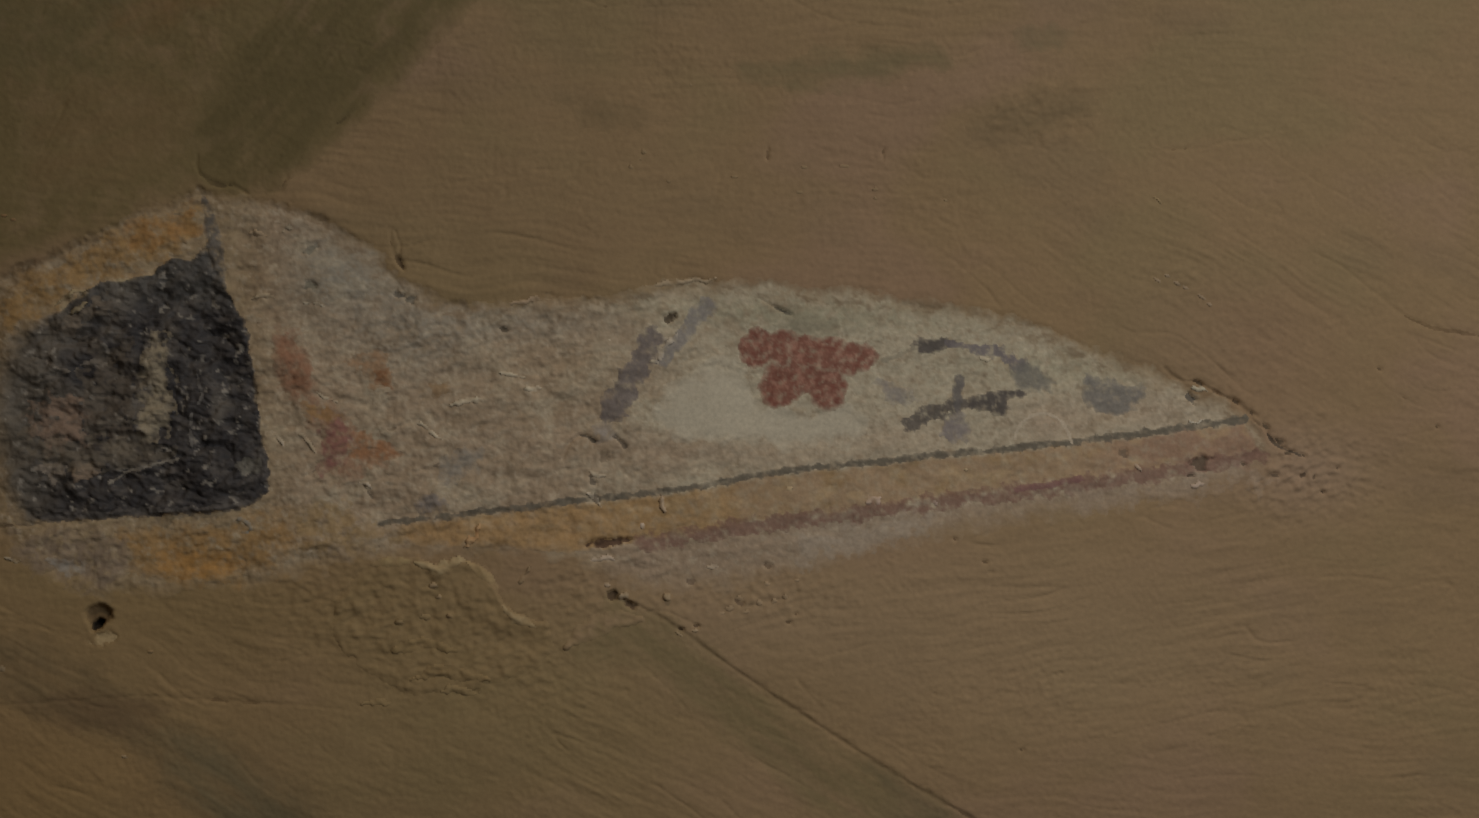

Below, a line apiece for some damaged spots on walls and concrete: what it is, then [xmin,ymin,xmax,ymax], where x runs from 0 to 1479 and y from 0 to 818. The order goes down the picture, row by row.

peeling [649,313,678,365]
peeling [17,291,204,487]
peeling [1185,379,1208,425]
spalling [1186,455,1209,489]
spalling [585,523,645,562]